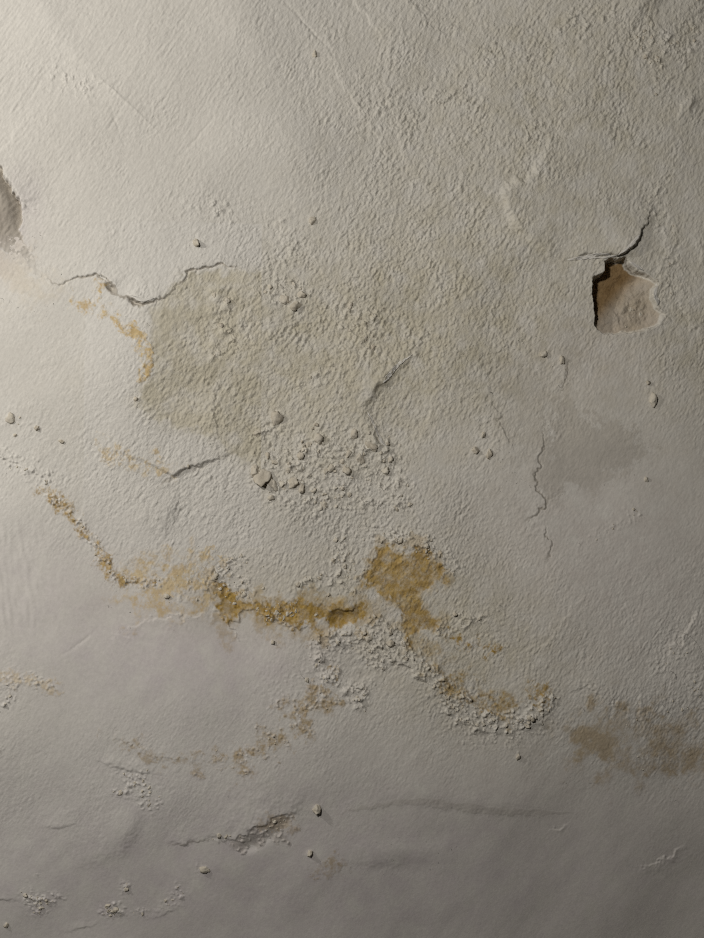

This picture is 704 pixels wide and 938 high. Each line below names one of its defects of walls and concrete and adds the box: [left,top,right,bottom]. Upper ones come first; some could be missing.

peeling [0,162,45,279]
crack [48,262,243,309]
spalling [591,254,668,336]
crack [156,450,238,489]
flaking render [132,252,502,646]
crack [525,361,569,563]
rust [30,483,561,733]
flaking render [300,614,558,740]
flaking render [166,801,303,855]